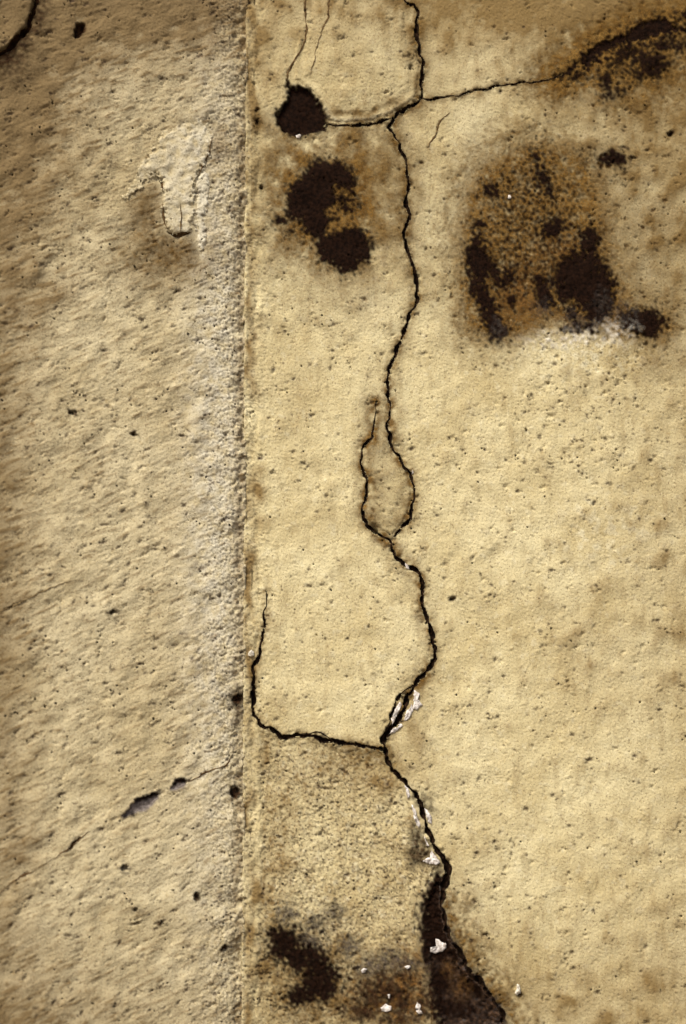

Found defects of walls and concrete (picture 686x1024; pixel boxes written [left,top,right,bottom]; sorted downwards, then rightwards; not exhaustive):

water stain [263,128,399,277]
water stain [445,131,683,347]
crack [250,0,561,1024]
spalling [122,792,159,818]
spalling [170,778,187,790]
water stain [264,905,357,1010]